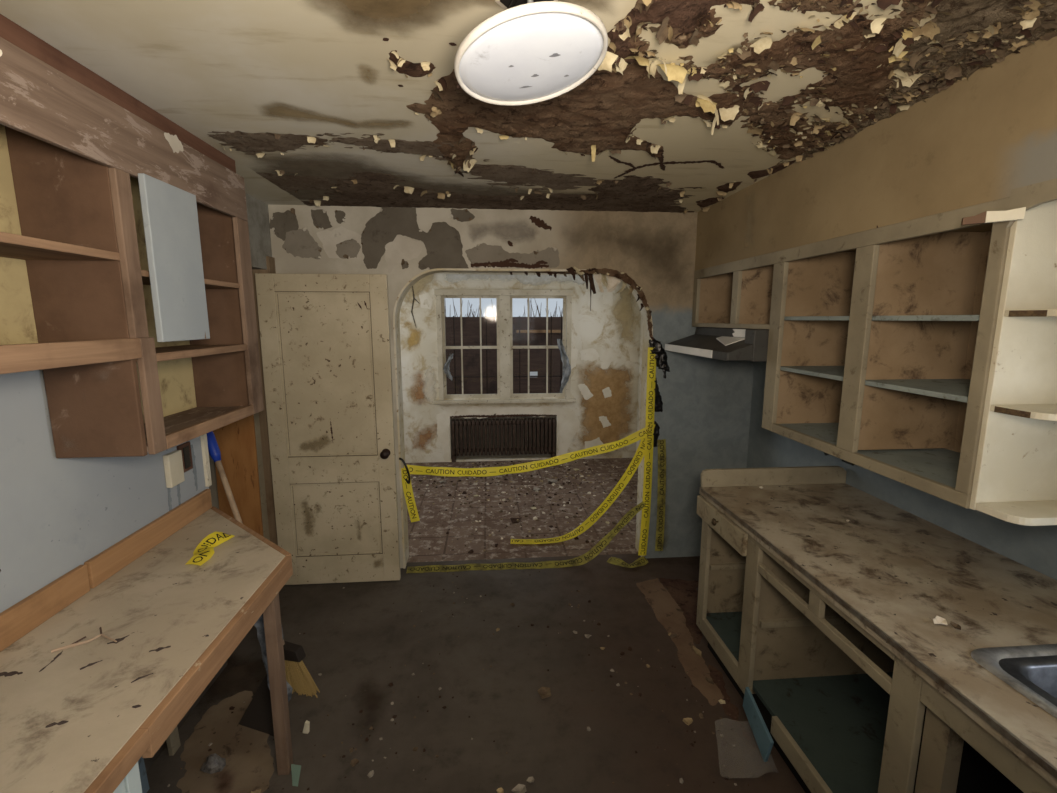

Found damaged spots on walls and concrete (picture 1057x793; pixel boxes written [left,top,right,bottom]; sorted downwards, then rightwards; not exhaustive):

leakage [322,0,457,27]
peeling [208,0,1057,340]
crack [609,150,724,179]